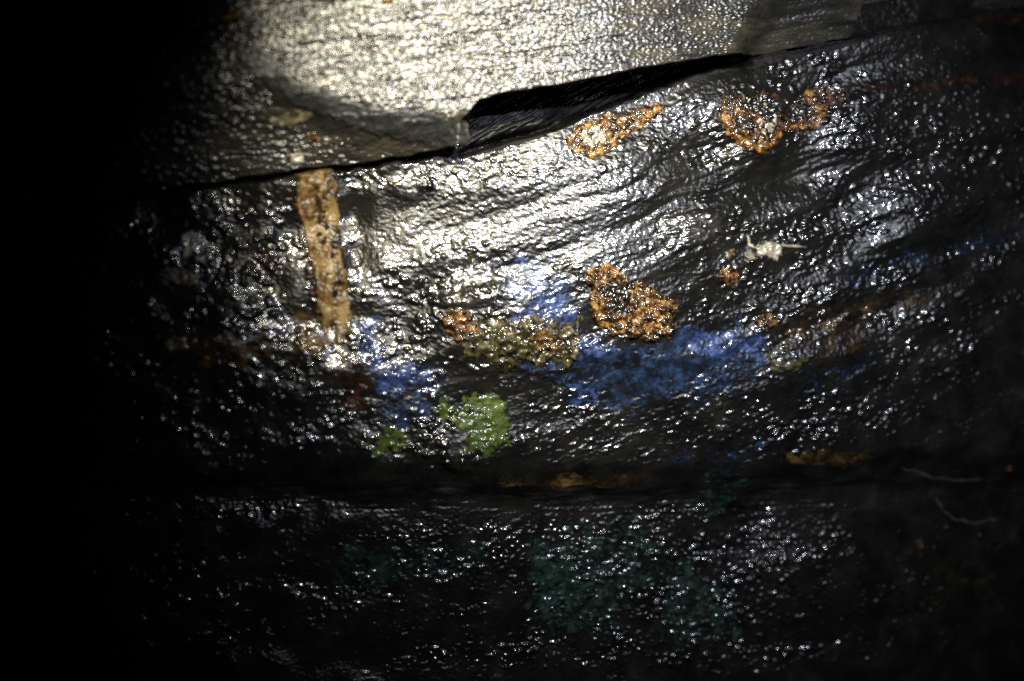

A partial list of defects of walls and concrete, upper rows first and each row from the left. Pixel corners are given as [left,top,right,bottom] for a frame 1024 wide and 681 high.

corrosion [566,102,663,159]
crack [331,27,915,173]
corrosion [717,72,1021,155]
crack [73,171,304,212]
corrosion [156,167,369,411]
corrosion [441,308,480,342]
corrosion [529,328,563,352]
corrosion [585,262,681,342]
water stain [350,317,512,458]